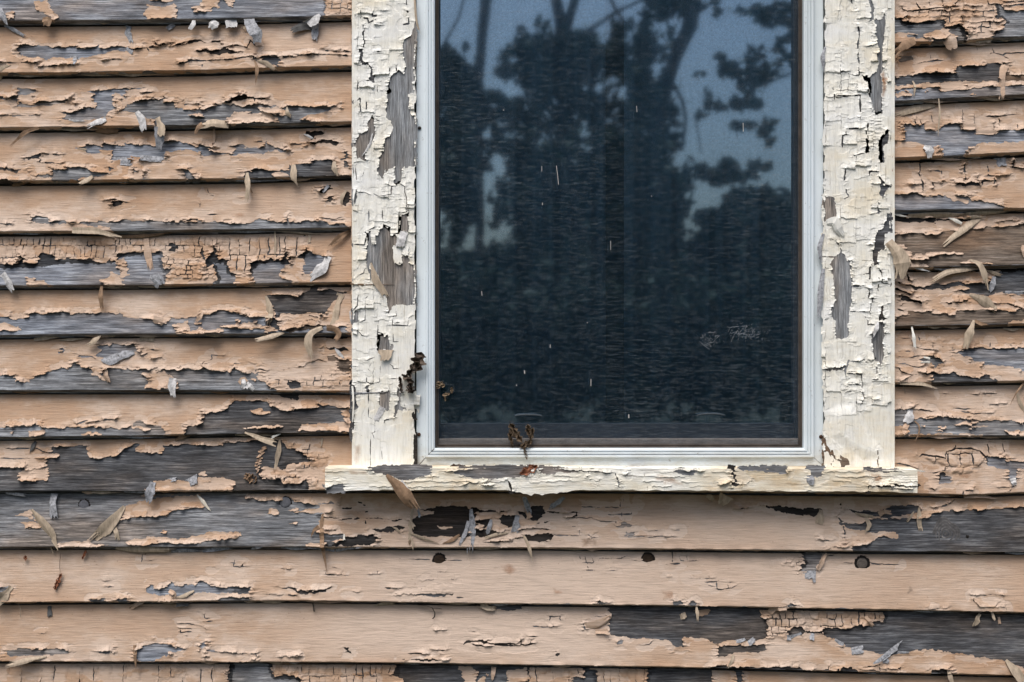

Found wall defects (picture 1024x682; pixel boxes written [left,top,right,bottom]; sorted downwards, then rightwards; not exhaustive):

peeling [816,0,1024,443]
crack [0,161,416,468]
peeling [0,0,688,610]
peeling [667,431,1024,583]
peeling [0,635,306,682]
peeling [336,641,359,660]
peeling [374,581,529,617]
peeling [387,624,602,682]
peeling [577,594,1024,682]
crack [765,607,888,644]